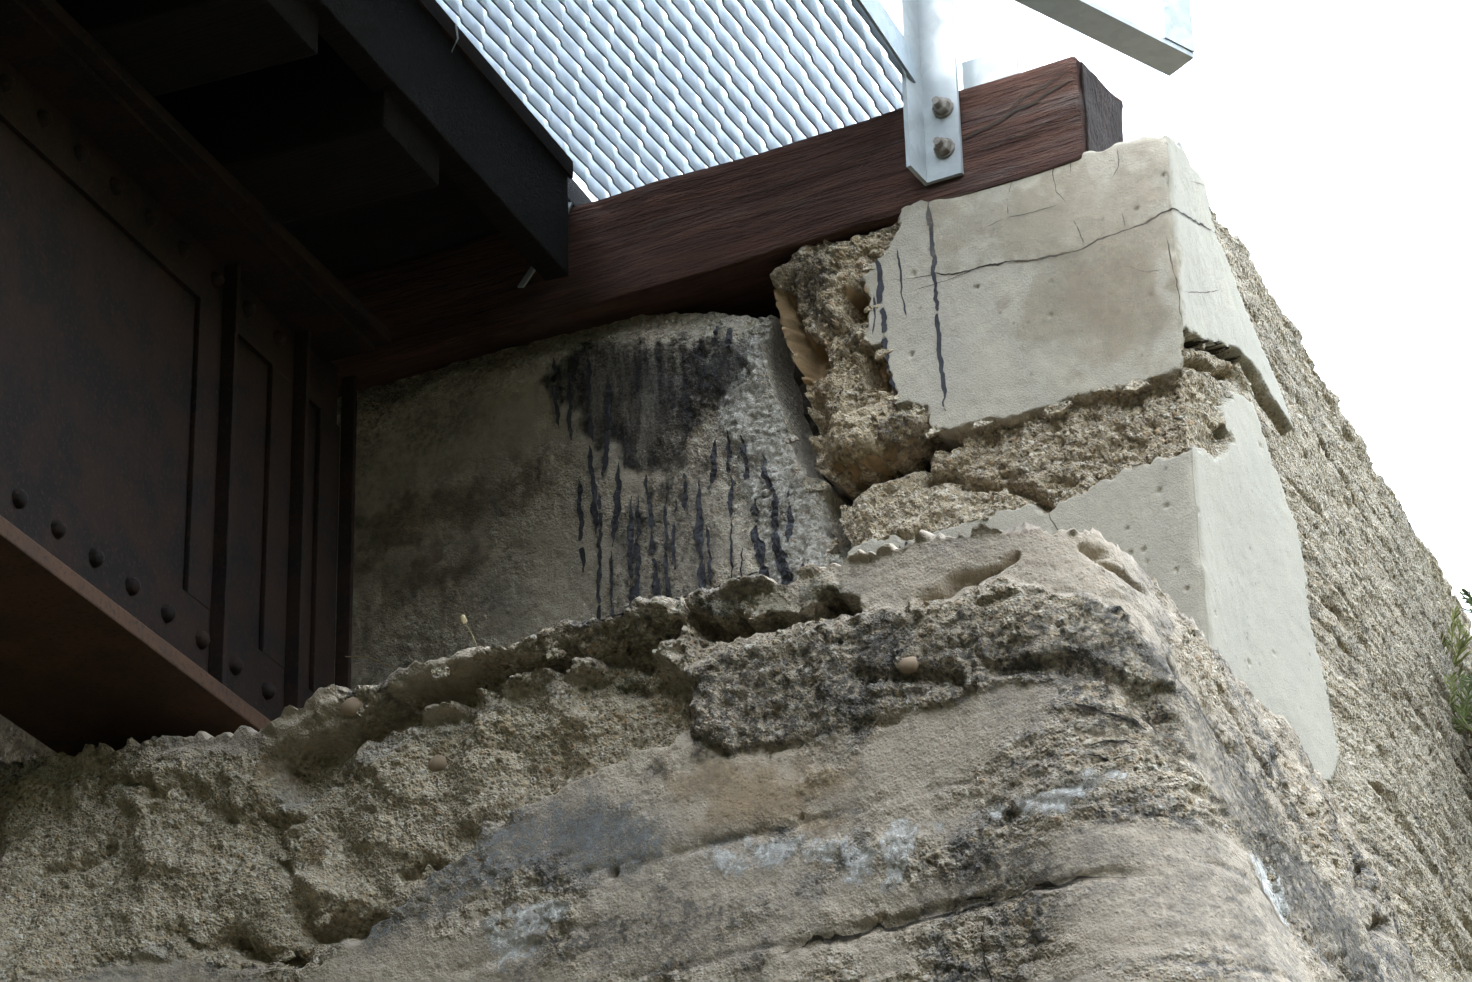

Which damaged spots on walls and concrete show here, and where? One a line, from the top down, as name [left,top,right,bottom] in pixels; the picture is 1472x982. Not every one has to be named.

water stain [551,252,876,652]
water stain [872,355,892,393]
water stain [832,414,944,492]
water stain [897,250,906,314]
spalling [736,234,1243,582]
crack [897,164,1240,364]
spalling [0,604,827,978]
crack [783,876,1127,982]